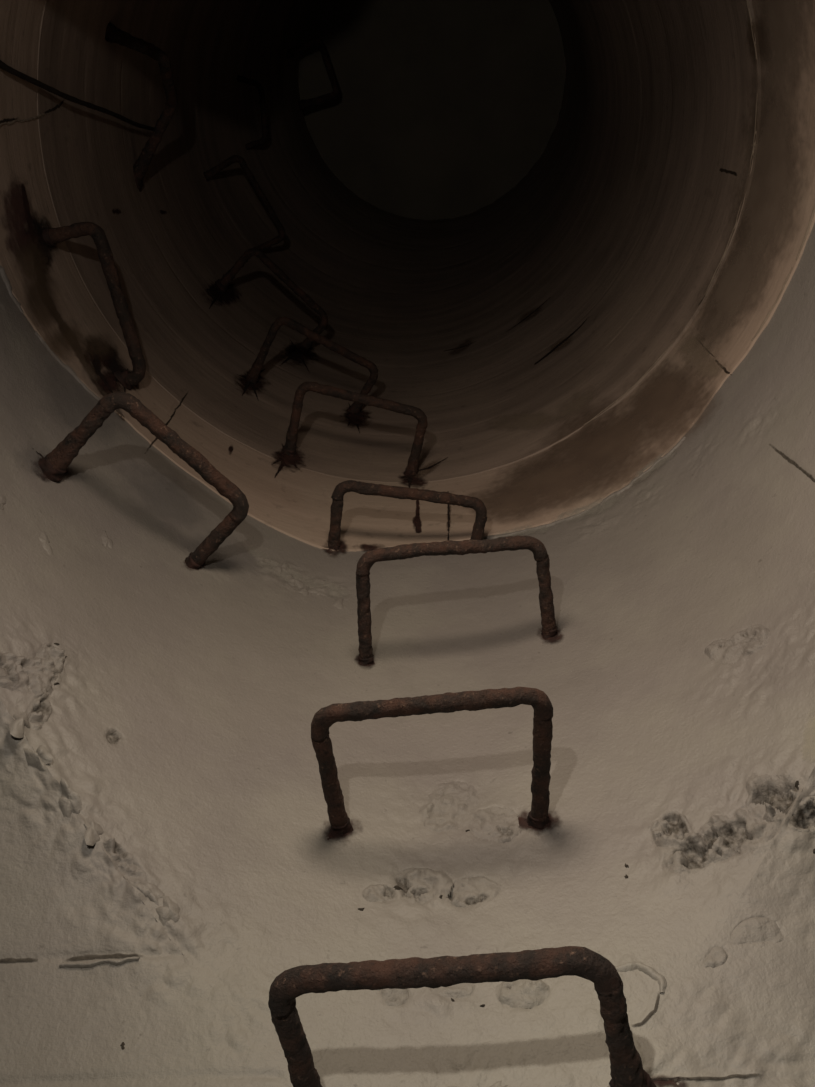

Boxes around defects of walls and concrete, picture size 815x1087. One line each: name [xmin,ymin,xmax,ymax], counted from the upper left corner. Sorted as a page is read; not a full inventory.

damp [699,0,809,341]
corrosion [4,184,56,269]
corrosion [84,345,138,393]
damp [480,368,708,518]
corrosion [34,451,68,482]
crack [773,447,815,482]
corrosion [413,500,422,533]
corrosion [355,655,375,666]
corrosion [325,817,354,840]
corrosion [518,811,558,831]
crack [0,953,139,968]
corrosion [643,1069,689,1087]